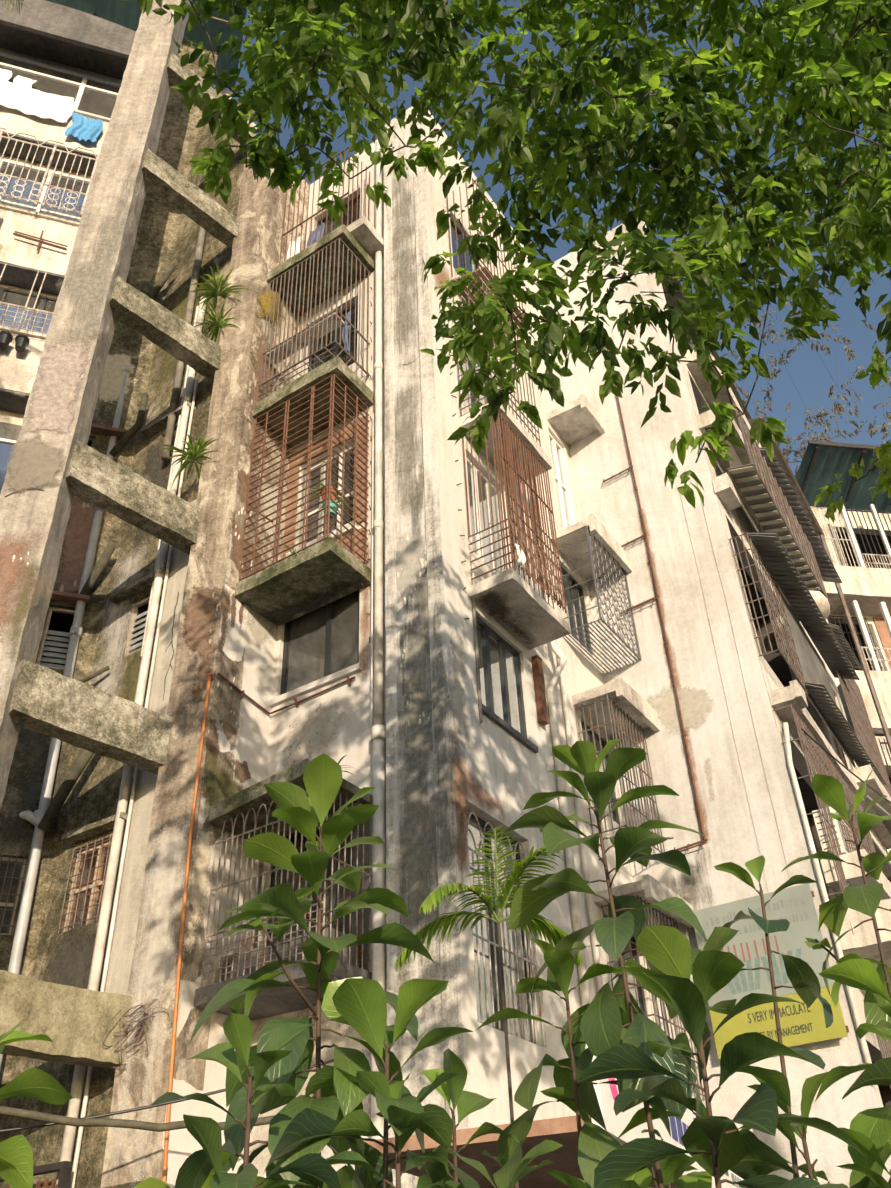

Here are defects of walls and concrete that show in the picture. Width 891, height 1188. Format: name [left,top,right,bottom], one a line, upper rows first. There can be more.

damp [165,256,213,336]
damp [392,178,418,348]
damp [143,431,186,490]
damp [97,529,147,694]
peeling [183,586,244,704]
damp [394,387,469,932]
corrosion [639,513,664,621]
corrosion [665,642,678,689]
damp [0,727,64,842]
peeling [202,710,251,798]
corrosion [451,737,503,871]
corrosion [683,728,708,839]